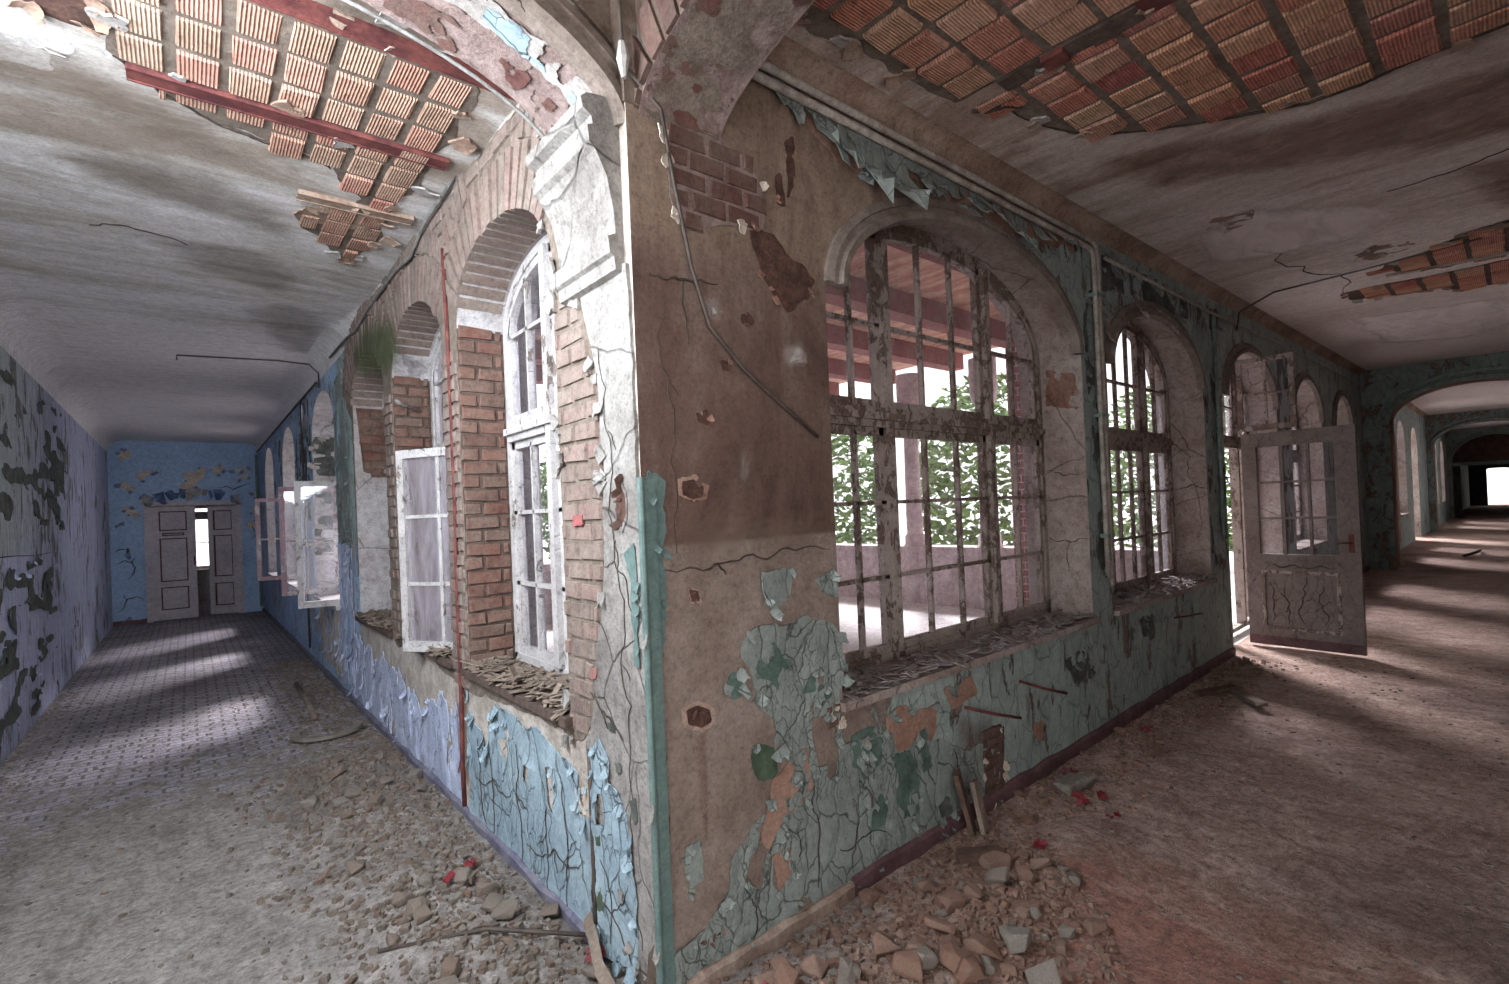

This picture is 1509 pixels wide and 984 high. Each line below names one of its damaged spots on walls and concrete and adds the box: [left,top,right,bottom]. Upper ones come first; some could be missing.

peeling [792,0,1509,143]
flaking render [902,145,1074,256]
peeling [1206,210,1255,233]
flaking render [0,0,1010,984]
crack [649,273,830,575]
crack [455,350,643,966]
crack [751,898,759,940]